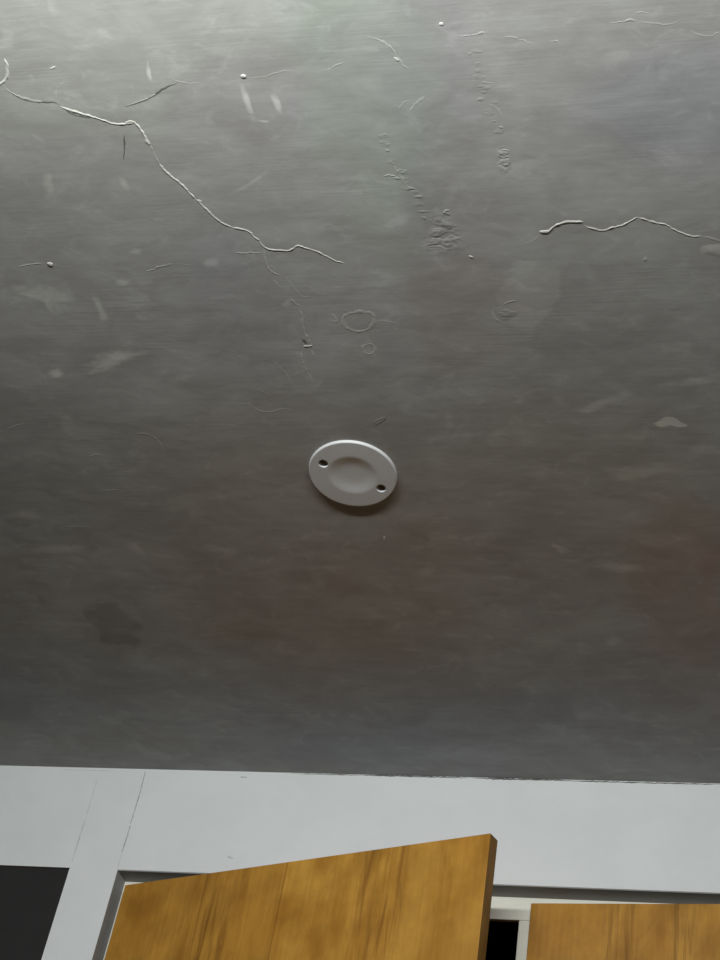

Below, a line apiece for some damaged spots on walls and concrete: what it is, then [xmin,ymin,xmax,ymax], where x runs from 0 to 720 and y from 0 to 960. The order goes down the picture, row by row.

crack [0,58,343,276]
crack [519,216,720,246]